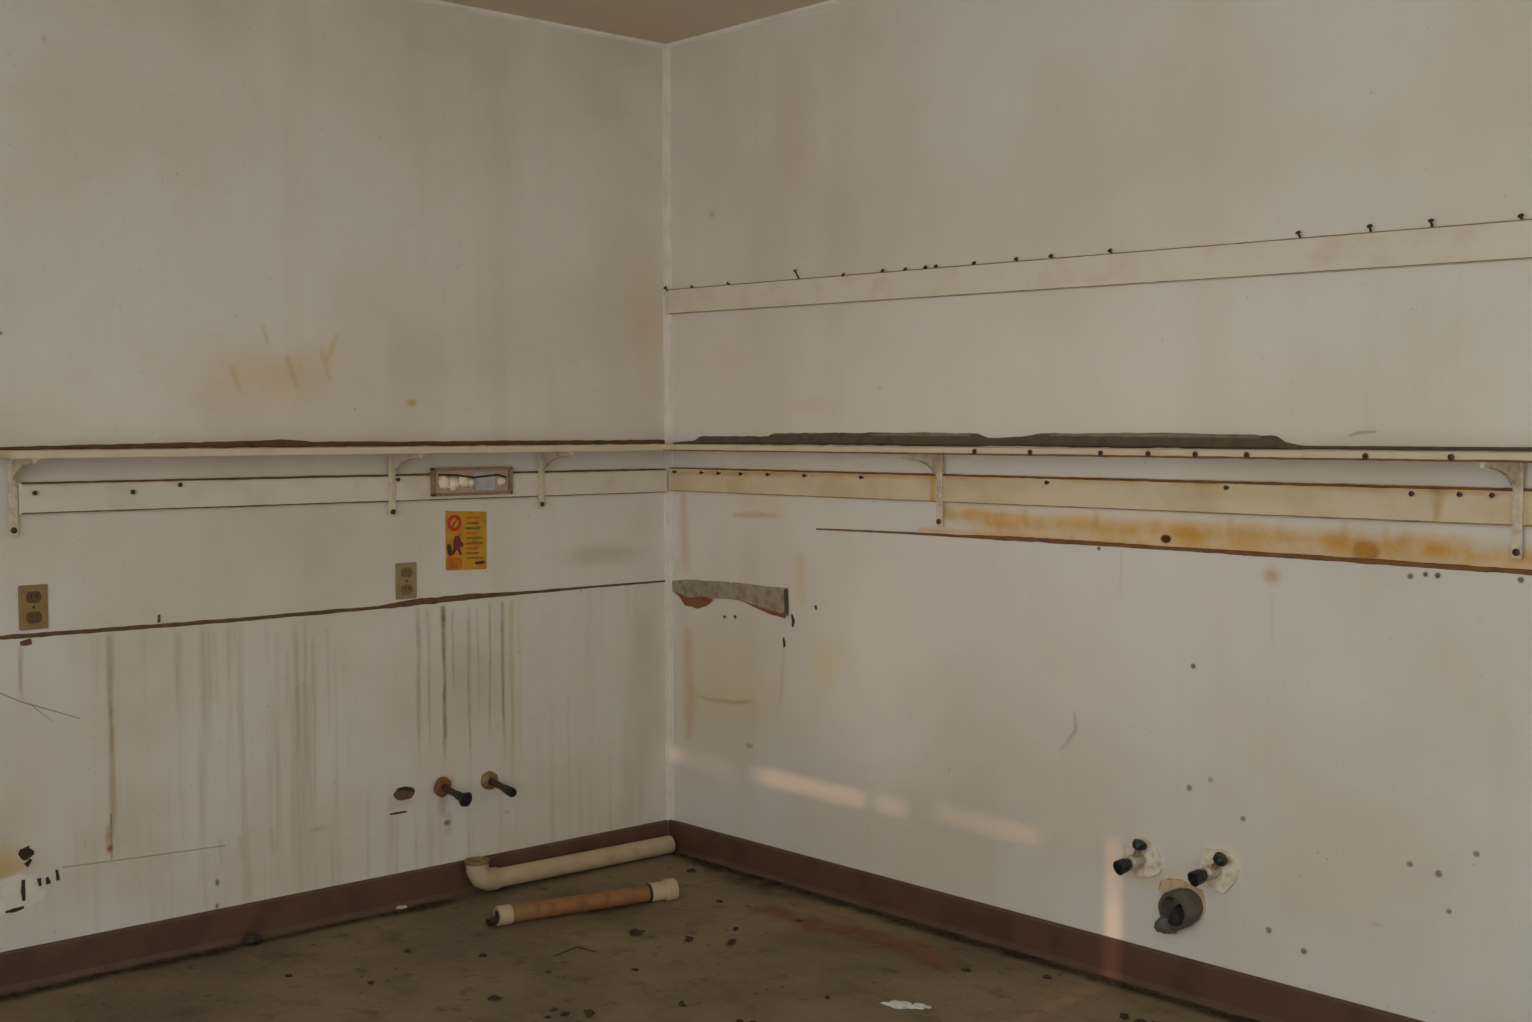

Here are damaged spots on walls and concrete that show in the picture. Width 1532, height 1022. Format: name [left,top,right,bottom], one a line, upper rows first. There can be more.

rust [513,467,1532,492]
rust [22,490,1532,527]
peeling [672,580,795,648]